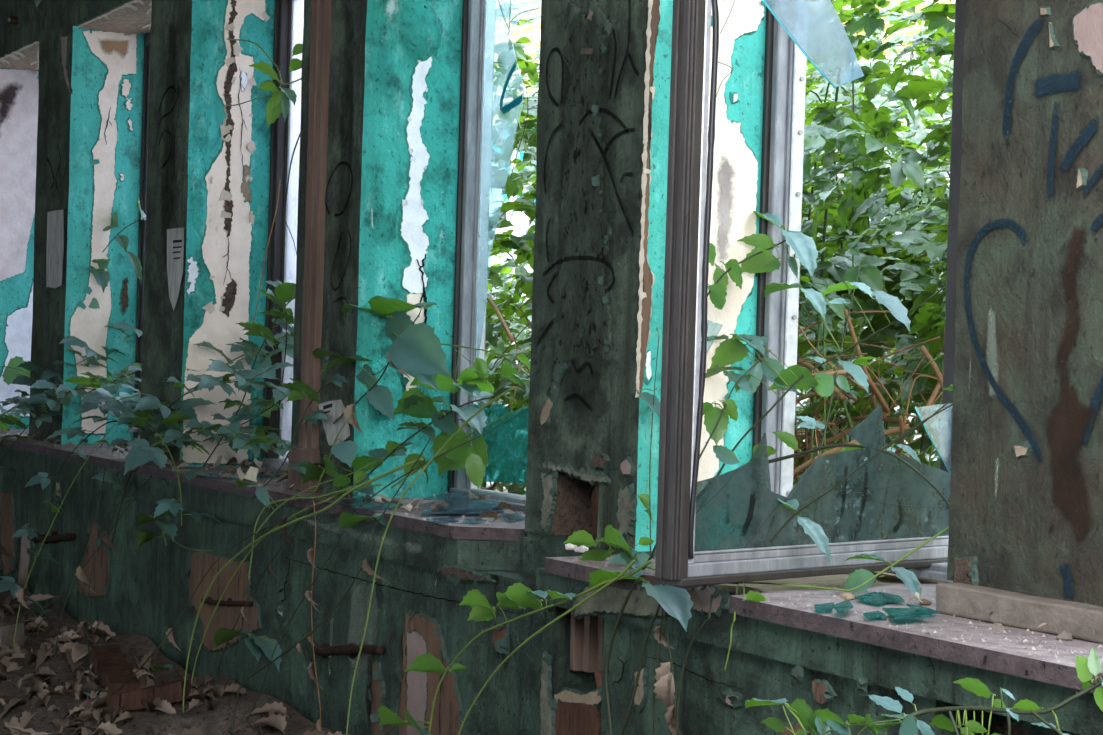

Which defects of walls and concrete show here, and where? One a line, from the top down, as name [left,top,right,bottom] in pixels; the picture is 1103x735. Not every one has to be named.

peeling [1040,6,1060,50]
peeling [1072,0,1103,77]
leakage [0,84,22,124]
crack [238,68,247,168]
peeling [0,41,39,418]
peeling [61,0,152,436]
peeling [179,0,270,466]
peeling [397,56,432,324]
peeling [697,0,767,482]
peeling [540,452,638,538]
peeling [187,549,286,653]
peeling [398,610,463,735]